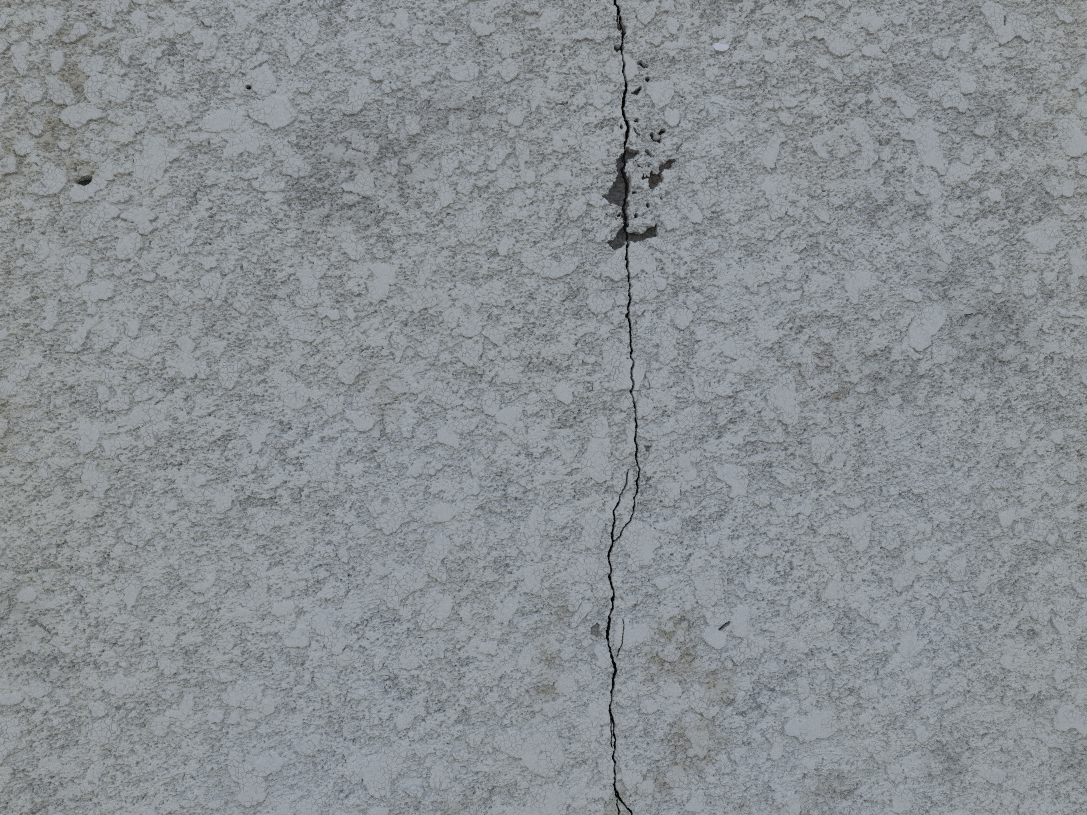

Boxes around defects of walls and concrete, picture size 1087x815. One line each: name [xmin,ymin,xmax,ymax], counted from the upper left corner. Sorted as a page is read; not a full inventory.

crack [606,0,640,815]
spalling [600,150,675,250]